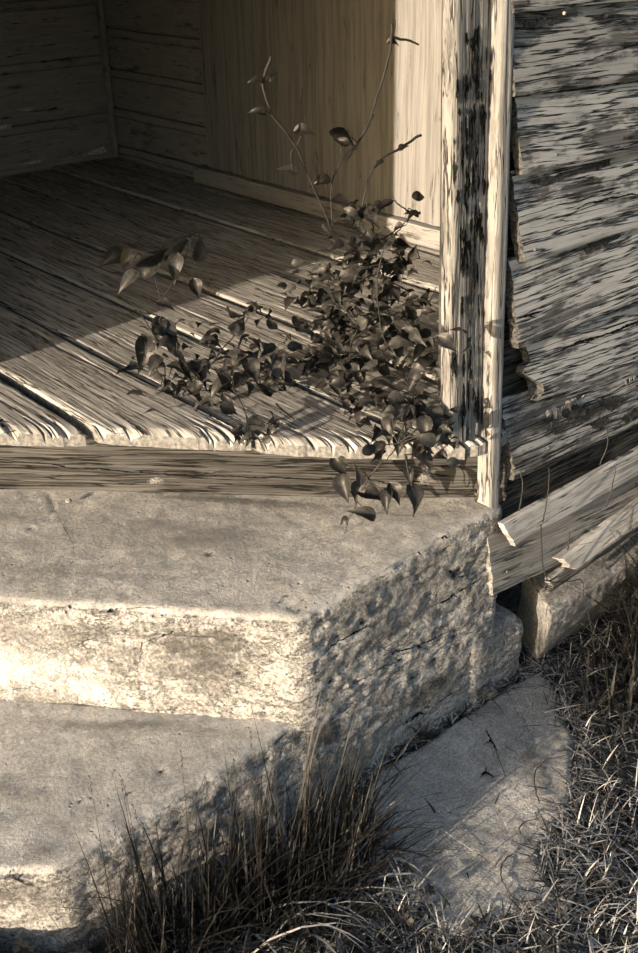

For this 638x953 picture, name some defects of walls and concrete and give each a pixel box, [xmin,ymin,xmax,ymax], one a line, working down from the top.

peeling [453,26,491,336]
crack [521,193,637,230]
peeling [450,337,484,444]
peeling [543,395,638,431]